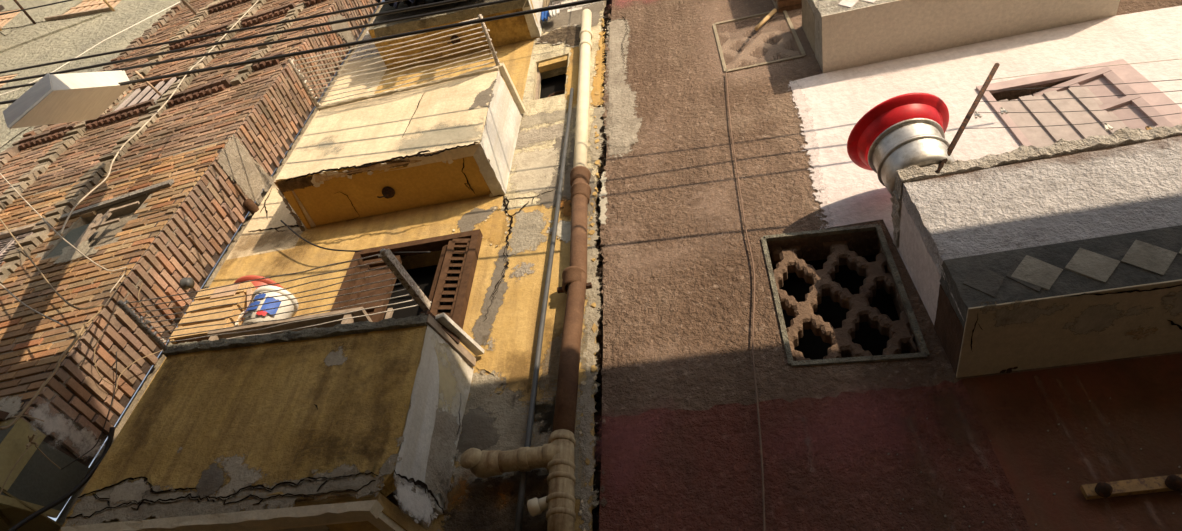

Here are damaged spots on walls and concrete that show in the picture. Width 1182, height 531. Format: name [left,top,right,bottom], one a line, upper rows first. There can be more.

spalling [276,156,422,231]
crack [248,93,475,232]
crack [485,190,553,320]
spalling [452,2,608,531]
crack [66,470,444,519]
spalling [65,333,562,531]